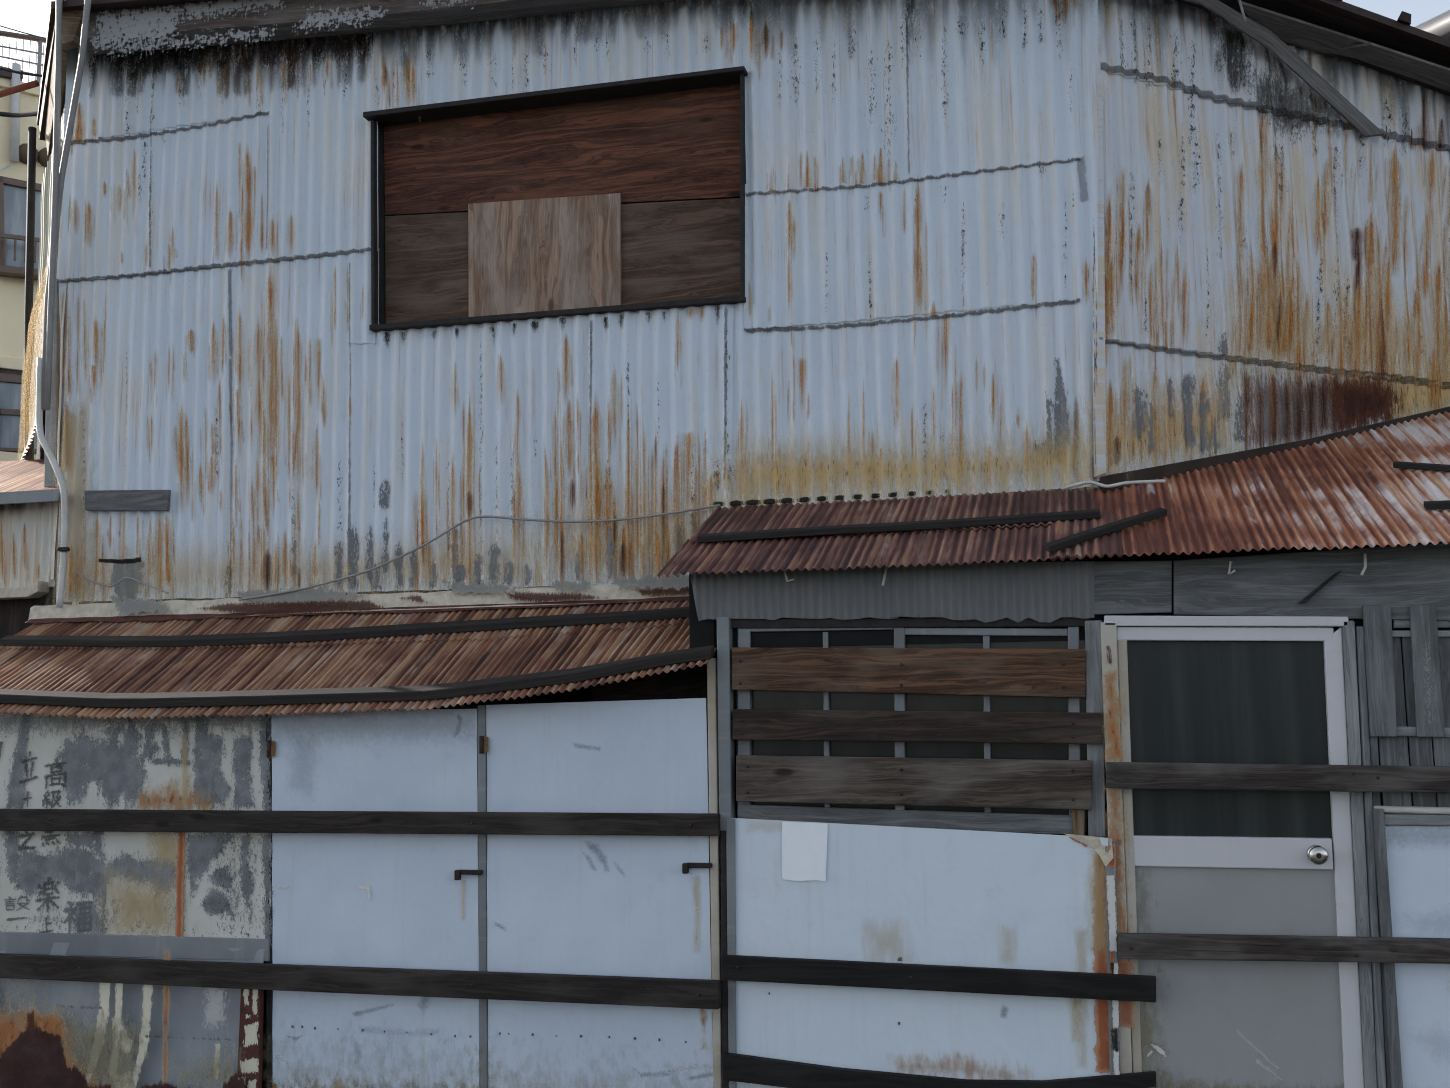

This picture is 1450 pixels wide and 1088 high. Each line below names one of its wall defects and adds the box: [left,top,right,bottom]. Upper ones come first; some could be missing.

peeling [90,0,389,58]
leakage [88,0,748,234]
leakage [777,24,921,151]
leakage [957,2,1063,66]
rust [1230,95,1450,446]
rust [544,150,1227,580]
rust [175,280,326,589]
peeling [0,712,272,811]
peeling [2,831,274,948]
peeling [86,982,153,1088]
peeling [238,989,259,1088]
rust [1093,999,1135,1073]